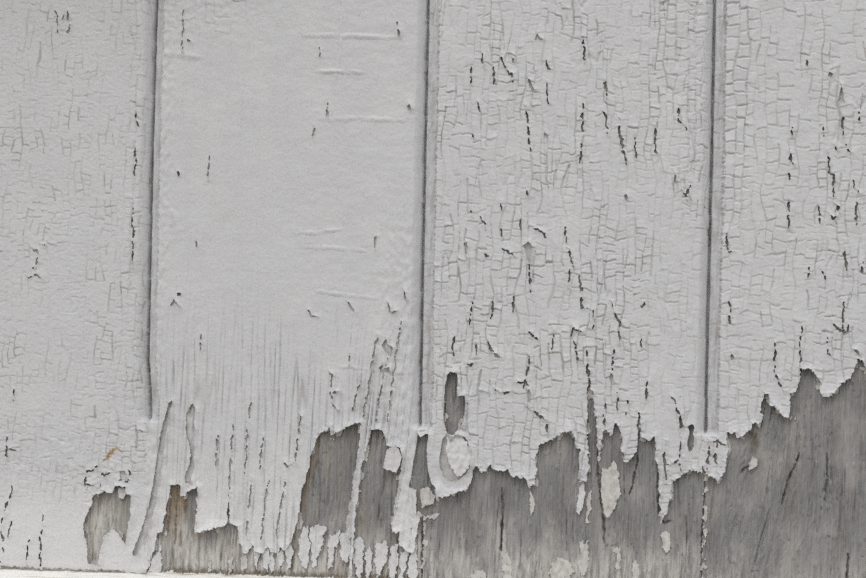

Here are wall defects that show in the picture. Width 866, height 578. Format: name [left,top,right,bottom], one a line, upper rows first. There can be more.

crack [470,54,513,112]
crack [524,111,532,152]
crack [579,81,658,165]
crack [818,111,860,225]
crack [451,203,642,395]
crack [773,343,782,387]
crack [826,302,849,356]
crack [843,251,864,273]
crack [84,465,132,487]
peeling [83,349,866,578]
crack [596,381,649,543]
crack [0,485,44,566]